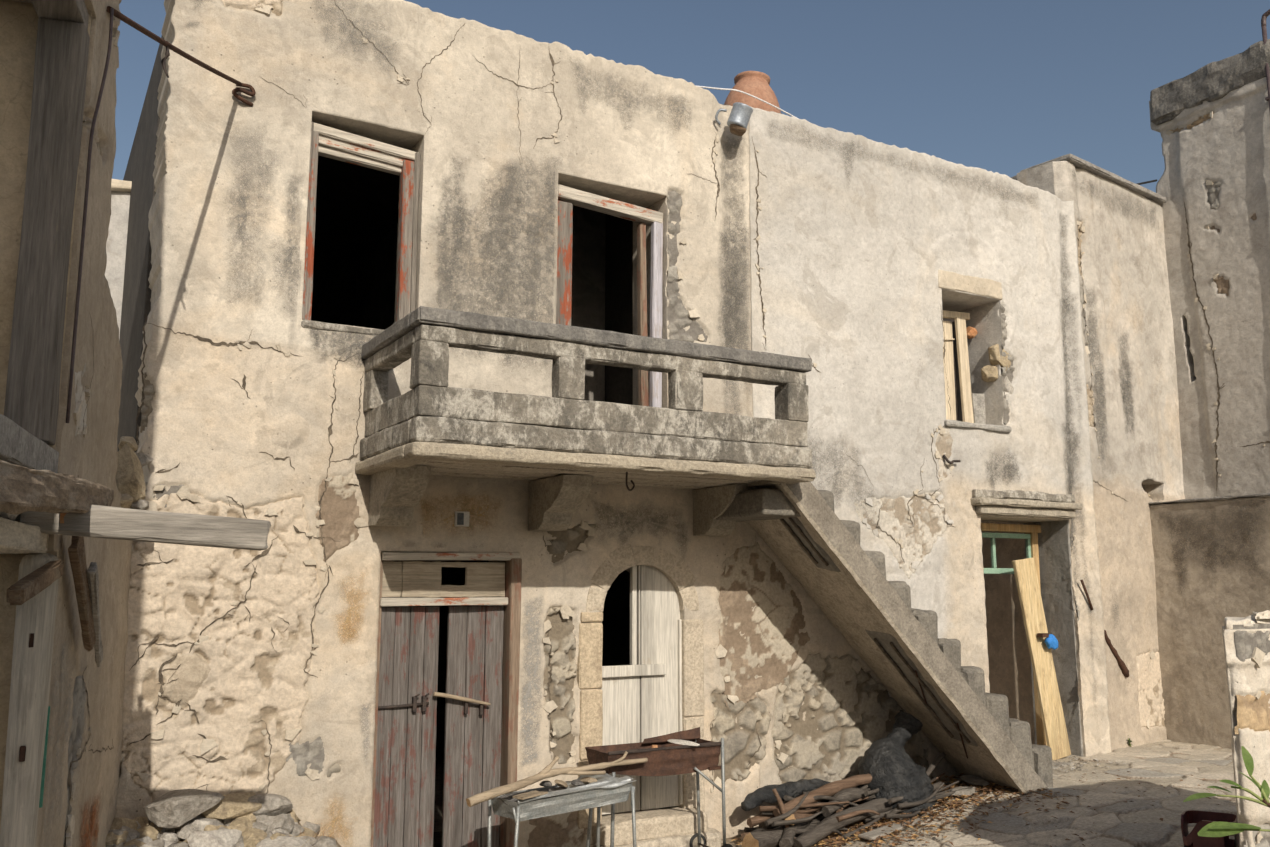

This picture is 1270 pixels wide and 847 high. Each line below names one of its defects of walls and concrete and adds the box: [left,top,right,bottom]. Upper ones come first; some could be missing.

crack [334,0,562,159]
leakage [444,167,555,322]
leakage [722,141,747,348]
crack [752,139,767,350]
crack [136,314,304,473]
flaking render [854,427,954,579]
leakage [1064,388,1078,494]
crack [64,354,364,845]
flaking render [120,473,368,801]
flaking render [542,604,577,764]
flaking render [710,542,905,788]
flaking render [1233,624,1270,668]